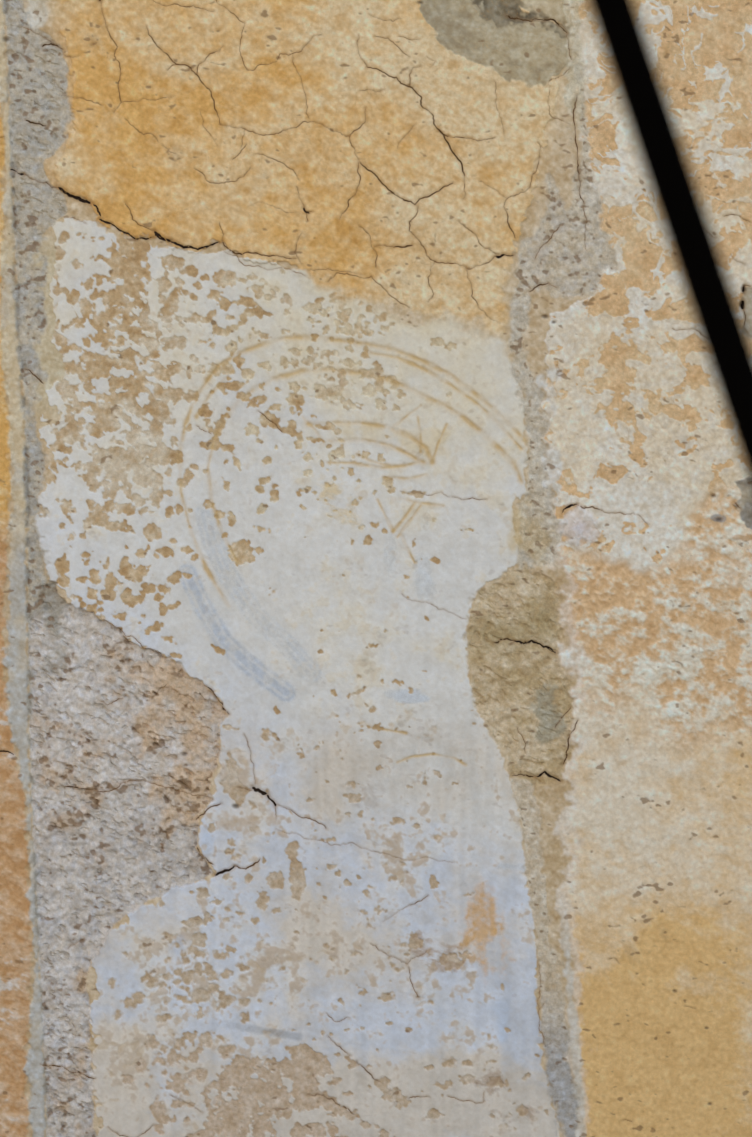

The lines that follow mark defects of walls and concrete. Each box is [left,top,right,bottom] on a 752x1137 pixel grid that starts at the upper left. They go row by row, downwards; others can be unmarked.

crack [10,0,587,321]
peeling [578,0,620,174]
peeling [633,0,752,271]
flaking render [6,0,427,1137]
peeling [567,522,666,565]
peeling [424,1034,497,1120]